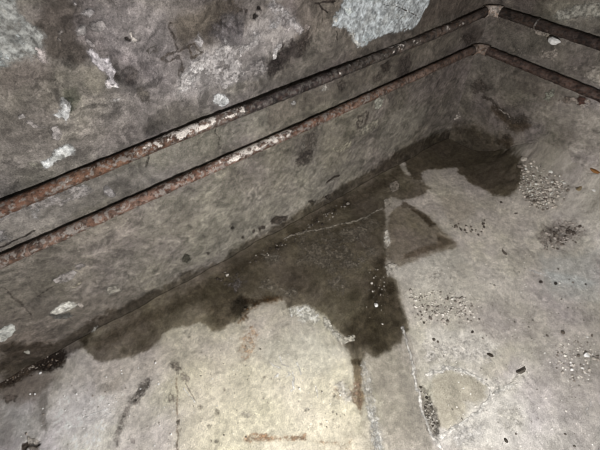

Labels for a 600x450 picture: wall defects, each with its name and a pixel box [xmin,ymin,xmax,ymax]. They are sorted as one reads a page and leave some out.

peeling [0,0,48,67]
peeling [333,0,430,48]
peeling [554,2,600,20]
peeling [88,49,149,101]
peeling [584,64,600,87]
peeling [54,98,74,121]
peeling [18,114,75,168]
damp [295,128,319,167]
damp [393,139,521,196]
peeling [26,185,91,218]
damp [219,200,395,345]
crack [401,326,528,450]